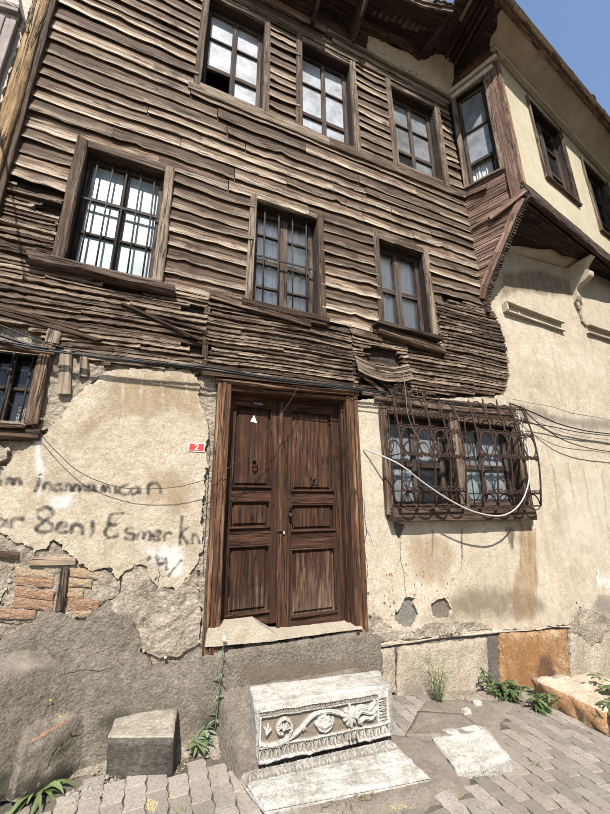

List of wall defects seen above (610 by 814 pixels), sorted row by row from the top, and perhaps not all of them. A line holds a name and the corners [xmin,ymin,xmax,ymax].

flaking render [39,355,112,431]
flaking render [0,445,9,462]
flaking render [0,533,202,659]
flaking render [367,543,493,641]